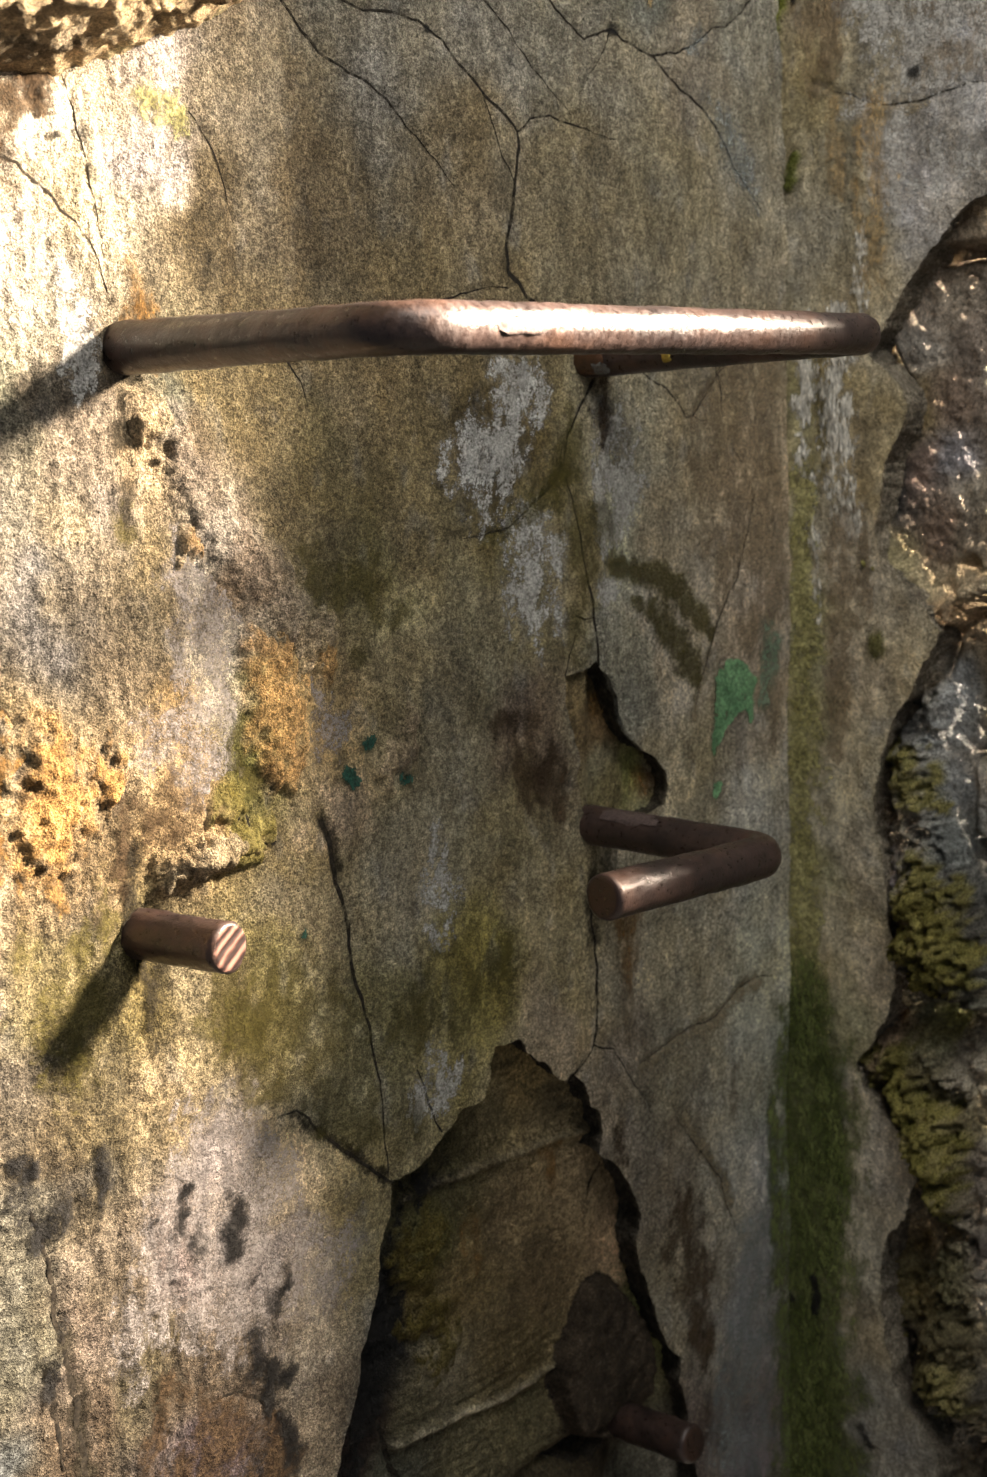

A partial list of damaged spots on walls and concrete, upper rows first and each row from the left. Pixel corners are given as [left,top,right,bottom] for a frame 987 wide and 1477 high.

crack [0,74,110,306]
crack [280,0,454,186]
crack [341,0,762,302]
rust [574,354,610,375]
damp [437,354,567,656]
crack [277,809,394,1188]
damp [42,1315,70,1407]
damp [53,1142,114,1238]
peeling [153,1217,206,1264]
flaking render [138,1371,309,1477]
peeling [283,1262,295,1291]
spalling [337,1039,698,1477]